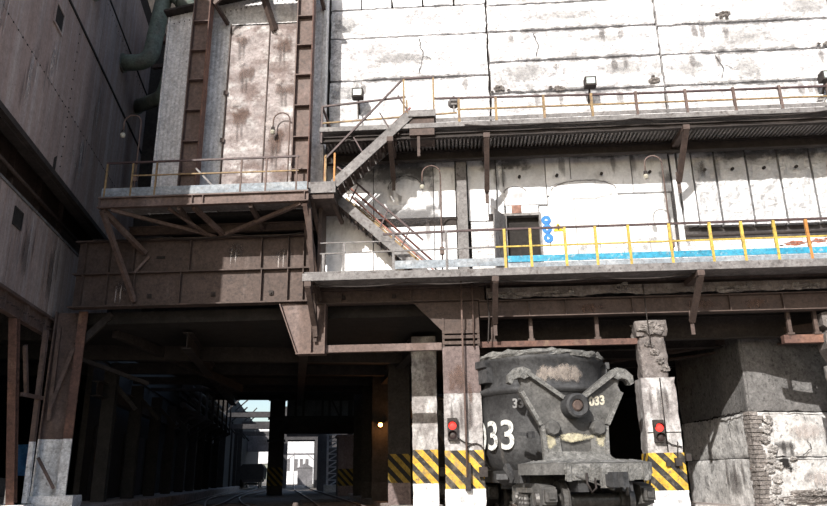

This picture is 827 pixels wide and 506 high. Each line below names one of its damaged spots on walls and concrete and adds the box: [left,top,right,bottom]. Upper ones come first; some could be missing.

corrosion [277,38,291,52]
corrosion [233,111,248,125]
corrosion [270,130,281,151]
spalling [636,321,670,371]